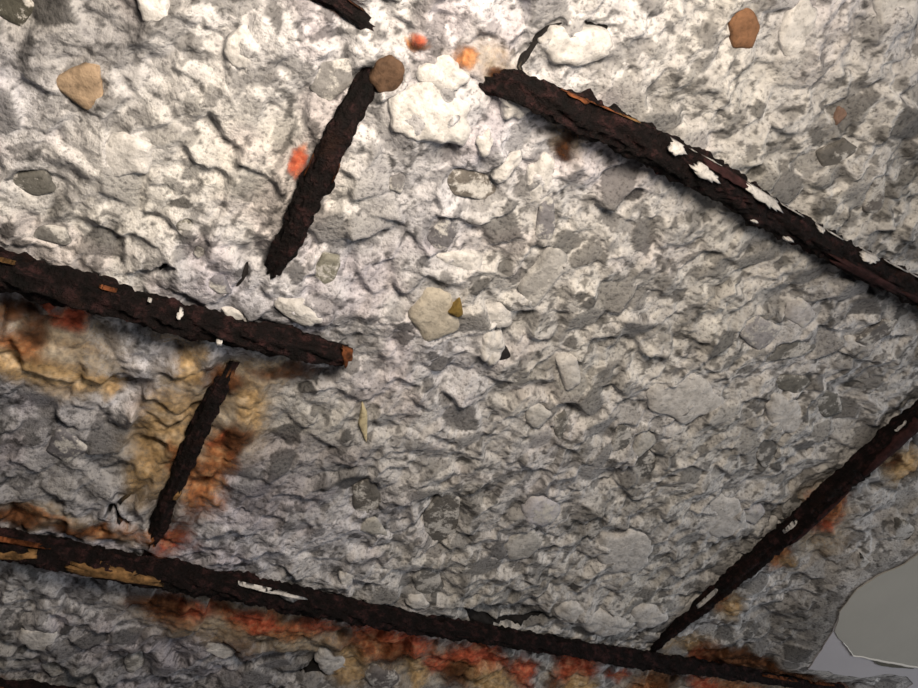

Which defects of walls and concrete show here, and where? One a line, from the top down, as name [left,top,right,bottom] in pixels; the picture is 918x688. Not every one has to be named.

rust [406,34,429,51]
spalling [538,24,613,66]
spalling [106,132,152,177]
spalling [264,68,375,280]
spalling [387,82,471,146]
rust [555,128,578,161]
spalling [478,69,918,308]
rust [0,299,120,394]
rust [132,333,315,509]
rust [128,593,336,649]
spalling [0,527,845,688]
rust [334,625,537,688]